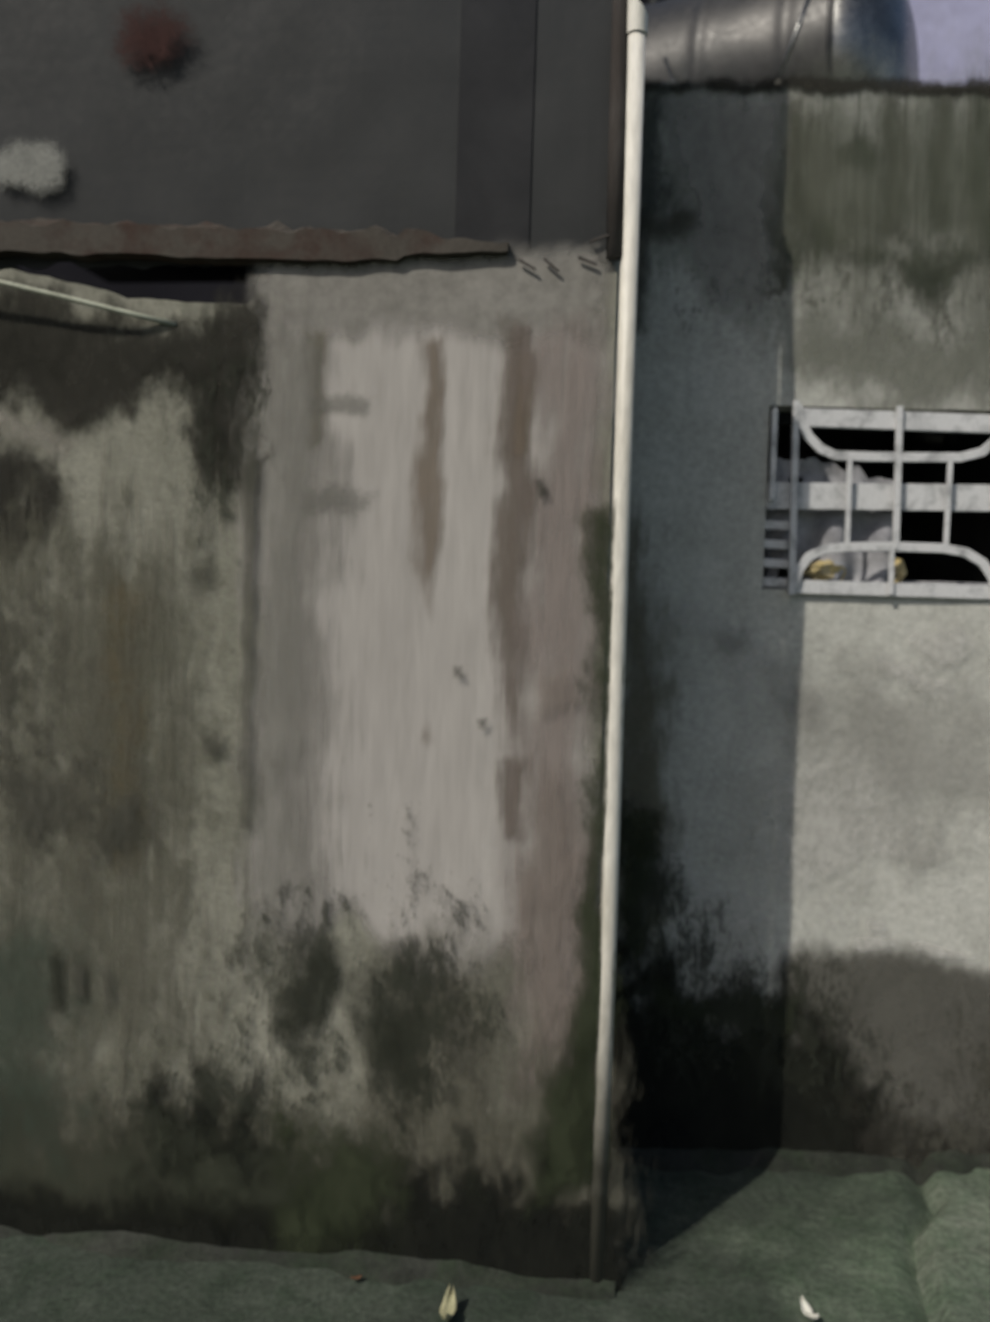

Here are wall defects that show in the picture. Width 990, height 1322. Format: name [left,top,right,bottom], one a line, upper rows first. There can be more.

leakage [636,75,990,330]
leakage [0,283,636,1292]
leakage [610,526,990,1168]